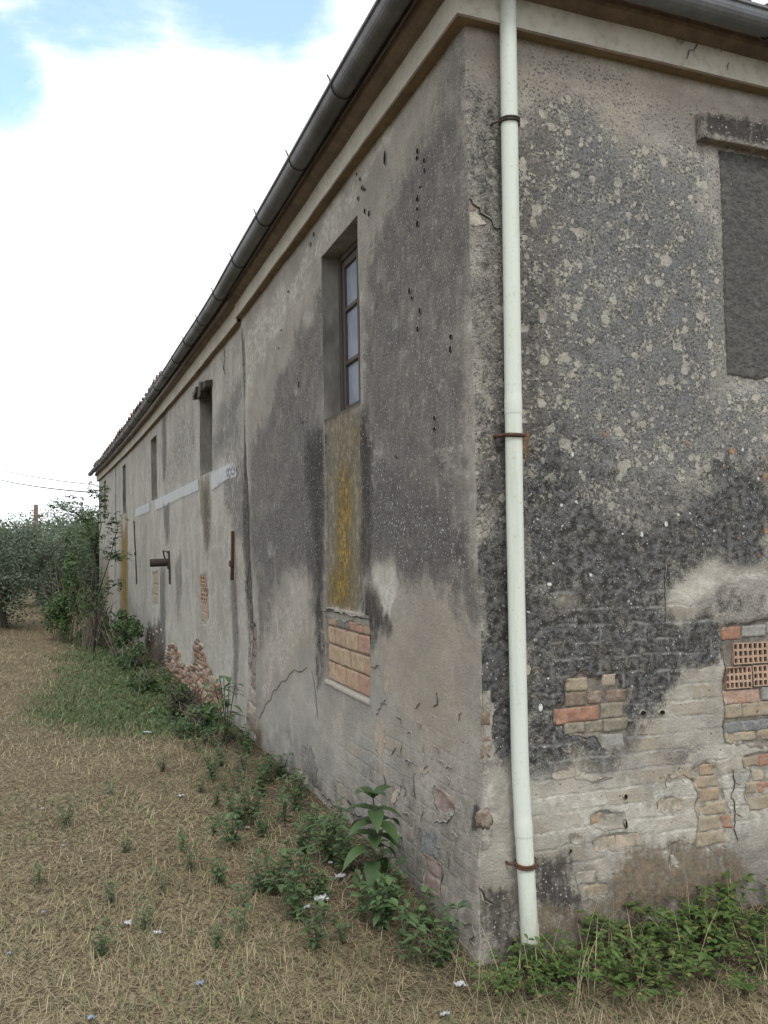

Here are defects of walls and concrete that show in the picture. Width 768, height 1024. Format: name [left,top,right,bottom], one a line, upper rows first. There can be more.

crack [470,198,500,240]
damp [304,424,328,680]
damp [360,408,391,650]
flaking render [538,668,665,752]
flaking render [720,618,768,811]
flaking render [552,767,603,782]
flaking render [657,761,733,851]
crack [731,770,743,842]